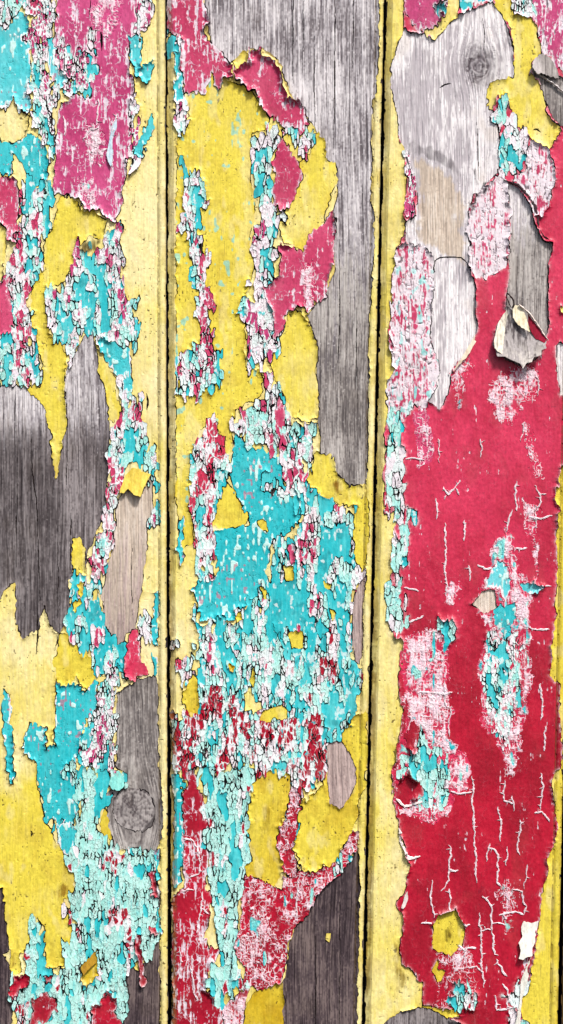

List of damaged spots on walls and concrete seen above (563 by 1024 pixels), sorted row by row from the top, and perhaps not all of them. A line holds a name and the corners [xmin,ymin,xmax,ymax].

peeling [0,0,163,1024]
peeling [166,0,563,1024]
crack [391,354,552,1011]